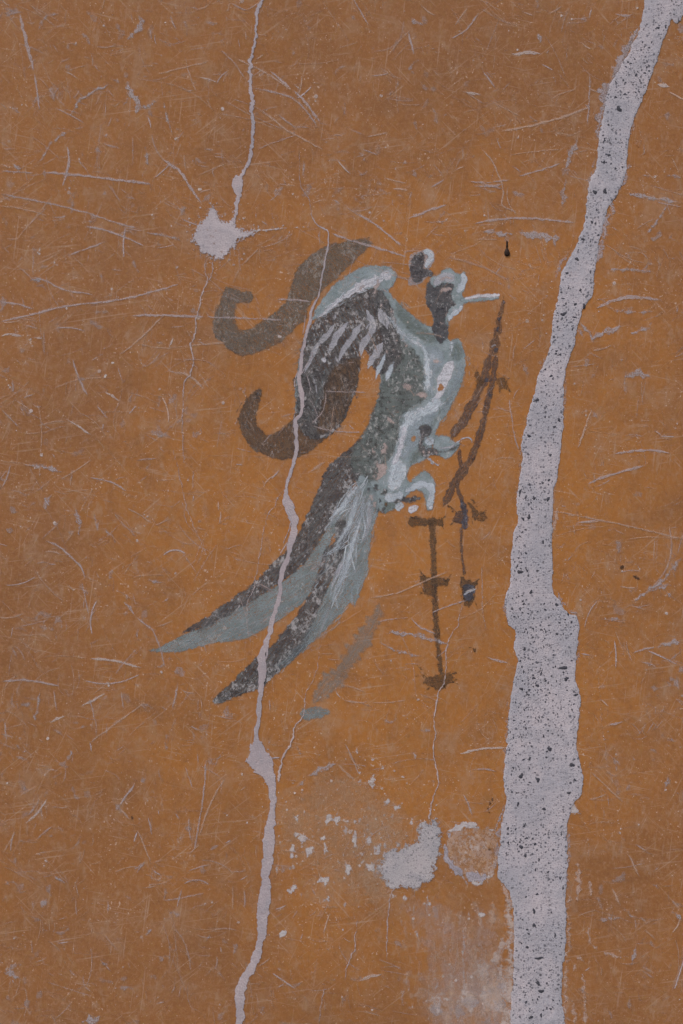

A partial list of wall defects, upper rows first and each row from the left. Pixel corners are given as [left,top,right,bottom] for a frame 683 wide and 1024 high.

crack [231,0,263,223]
crack [173,262,214,553]
crack [234,158,329,1024]
crack [493,0,683,1024]
spalling [289,812,498,898]